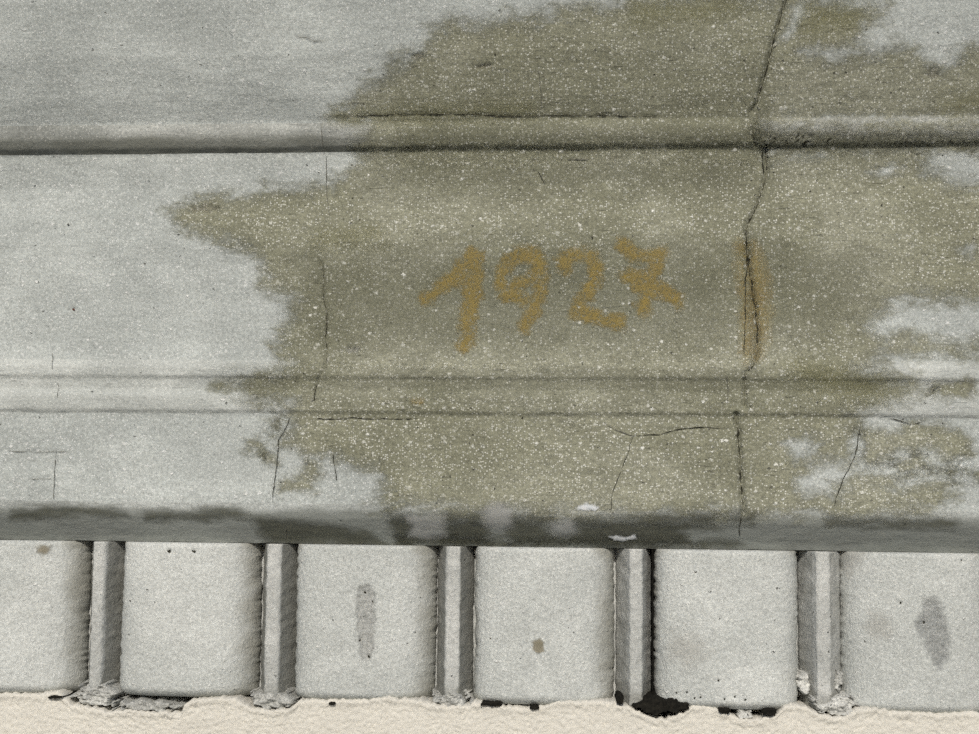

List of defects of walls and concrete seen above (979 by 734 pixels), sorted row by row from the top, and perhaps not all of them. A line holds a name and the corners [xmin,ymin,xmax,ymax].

crack [272,420,289,501]
crack [311,265,416,424]
damp [168,0,979,534]
crack [601,0,787,540]